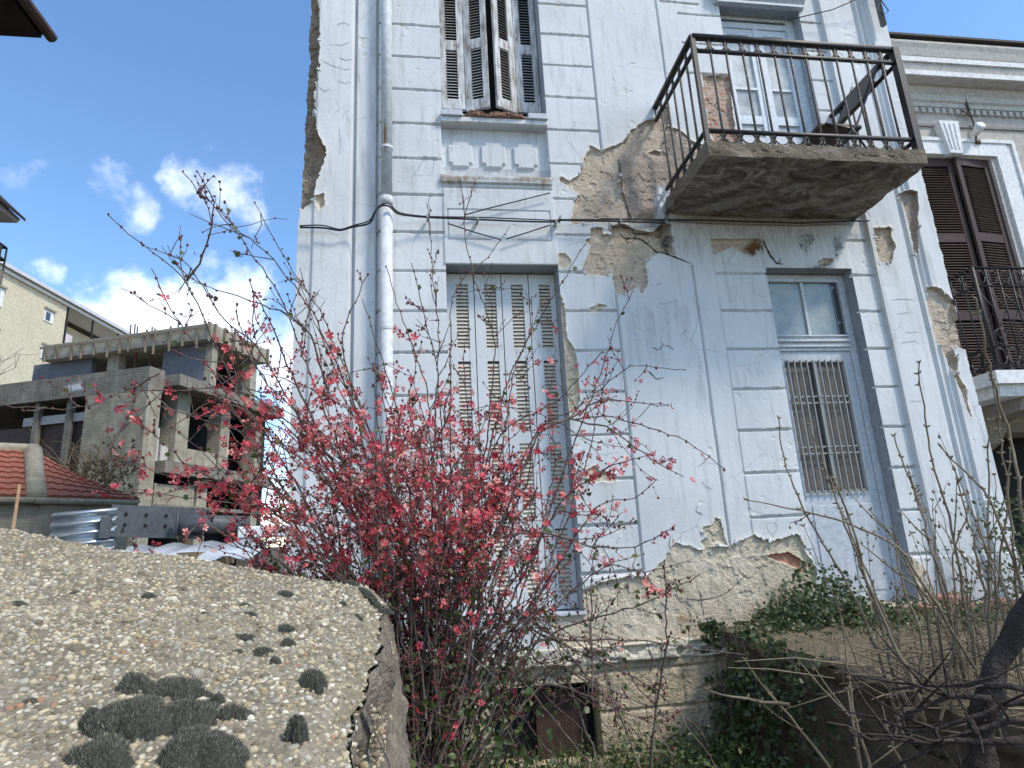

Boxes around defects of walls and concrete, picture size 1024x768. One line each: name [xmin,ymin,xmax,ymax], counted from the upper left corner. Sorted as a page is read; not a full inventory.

spalling [301,0,326,210]
flaking render [702,75,739,142]
spalling [558,106,673,296]
spalling [711,238,761,255]
spalling [874,226,896,265]
spalling [896,189,922,256]
spalling [560,294,580,416]
spalling [925,286,972,417]
spalling [552,517,817,648]